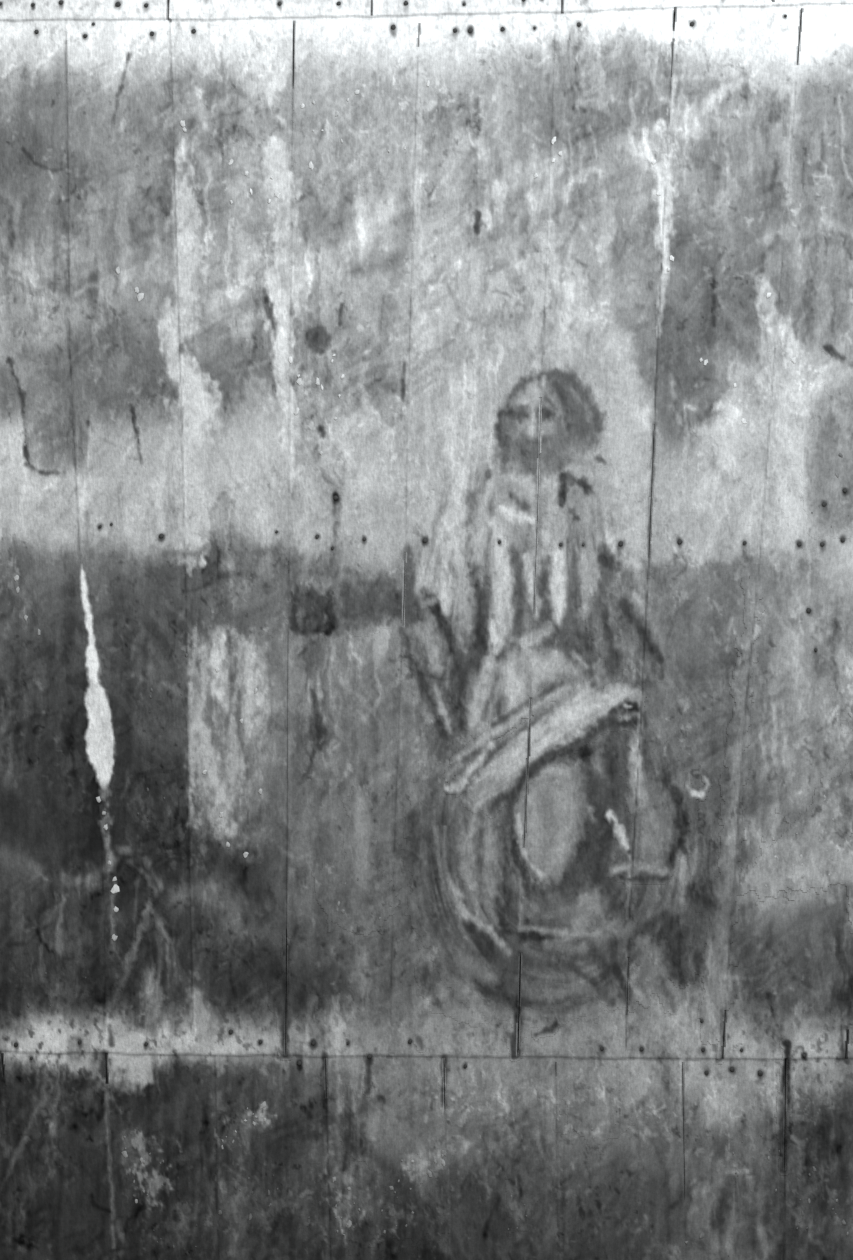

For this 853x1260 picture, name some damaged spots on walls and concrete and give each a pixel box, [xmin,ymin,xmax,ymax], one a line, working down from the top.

damp [0,0,853,241]
crack [5,355,75,479]
damp [0,120,853,642]
crack [780,318,792,362]
crack [820,341,853,369]
peeling [78,563,281,962]
peeling [8,929,96,1015]
damp [0,576,853,1260]